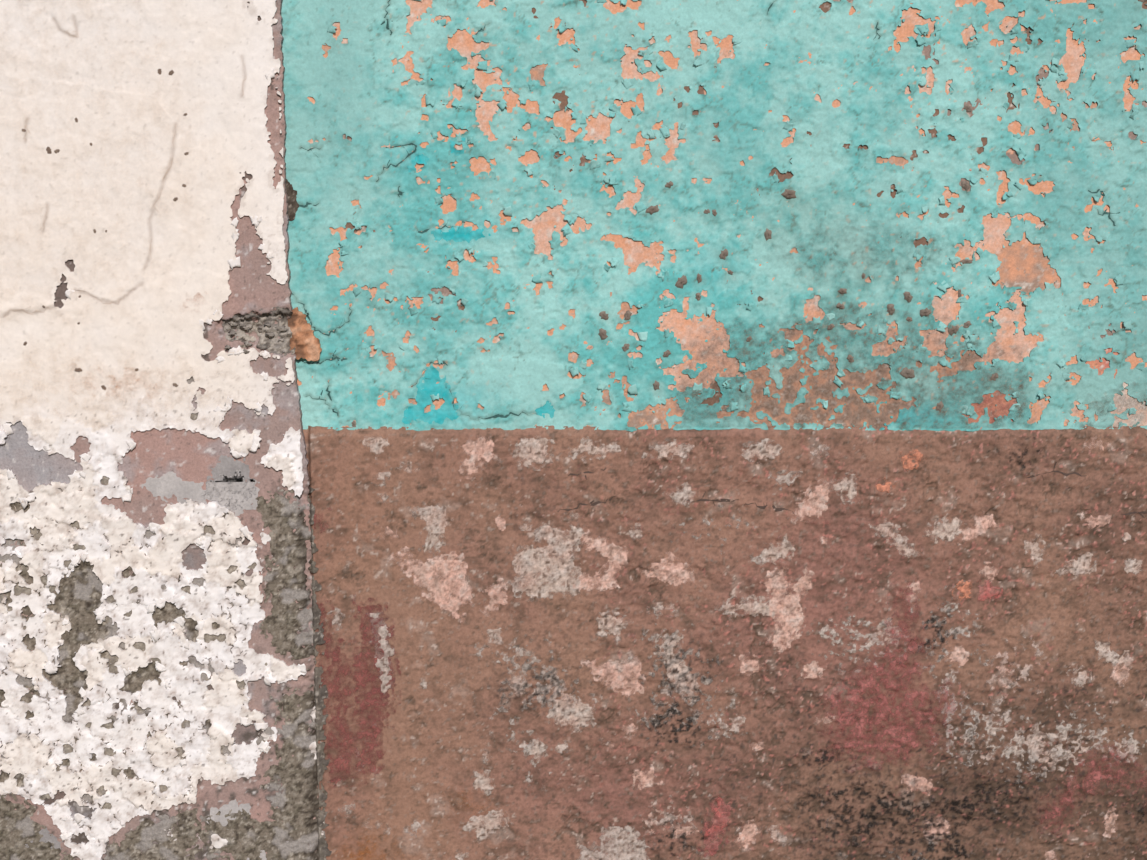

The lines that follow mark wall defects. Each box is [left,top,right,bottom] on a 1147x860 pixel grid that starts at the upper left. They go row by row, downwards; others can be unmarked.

peeling [258,0,284,189]
peeling [1120,24,1147,144]
peeling [322,0,706,321]
peeling [567,0,1097,429]
peeling [1084,192,1110,213]
peeling [365,325,420,371]
peeling [377,355,459,424]
peeling [477,302,515,352]
peeling [535,384,565,418]
peeling [959,319,1147,427]
peeling [1078,269,1124,310]
peeling [0,171,322,860]